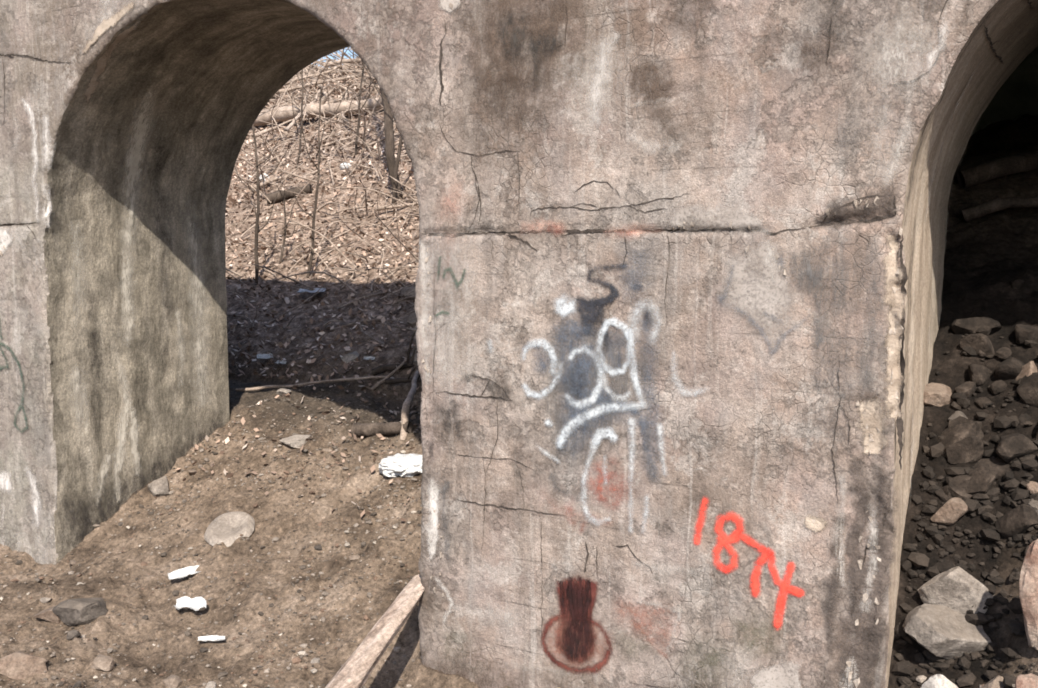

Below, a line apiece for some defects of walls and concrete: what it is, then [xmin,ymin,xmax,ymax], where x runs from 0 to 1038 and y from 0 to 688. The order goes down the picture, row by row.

crack [0,54,71,115]
peeling [440,0,460,12]
damp [462,0,577,118]
damp [592,35,617,121]
damp [631,63,671,125]
crack [984,25,1004,64]
spalling [818,189,893,227]
crack [426,16,908,576]
crack [432,266,565,649]
spalling [804,228,906,688]